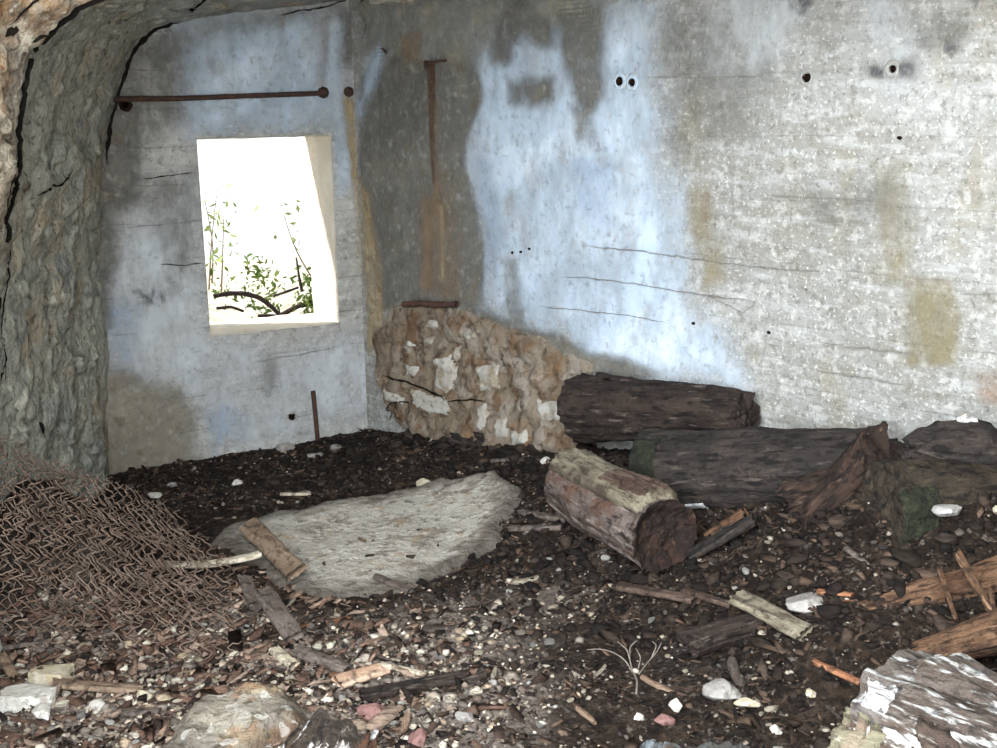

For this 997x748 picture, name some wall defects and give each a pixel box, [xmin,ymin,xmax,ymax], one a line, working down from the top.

crack [0,0,105,383]
crack [106,0,206,164]
leakage [177,12,352,129]
crack [280,0,366,33]
corrosion [344,98,383,350]
corrosion [428,63,438,196]
leakage [340,0,734,380]
crack [385,376,482,420]